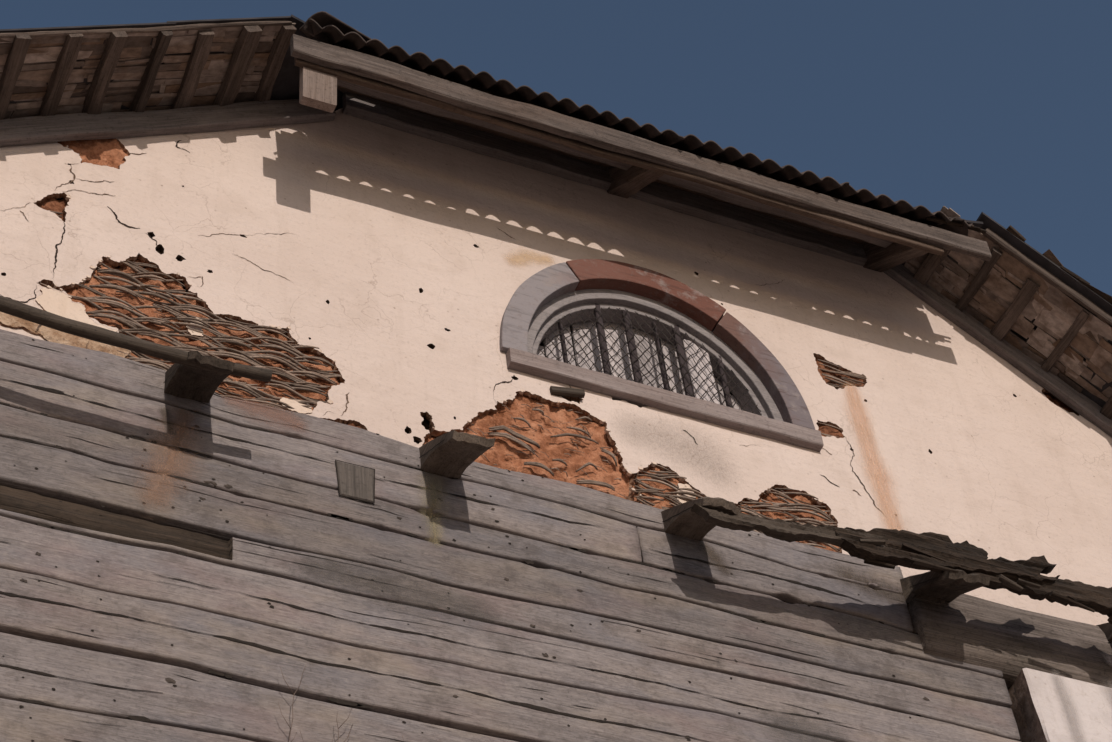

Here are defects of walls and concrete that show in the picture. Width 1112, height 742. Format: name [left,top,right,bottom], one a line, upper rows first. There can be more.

spalling [34,193,71,222]
crack [2,163,158,247]
spalling [58,139,130,169]
crack [1,220,89,353]
crack [3,379,349,463]
spalling [0,253,368,431]
spalling [420,386,706,510]
crack [337,465,904,608]
spalling [734,484,838,534]
spalling [813,353,867,390]
crack [0,577,710,742]
crack [119,520,904,738]